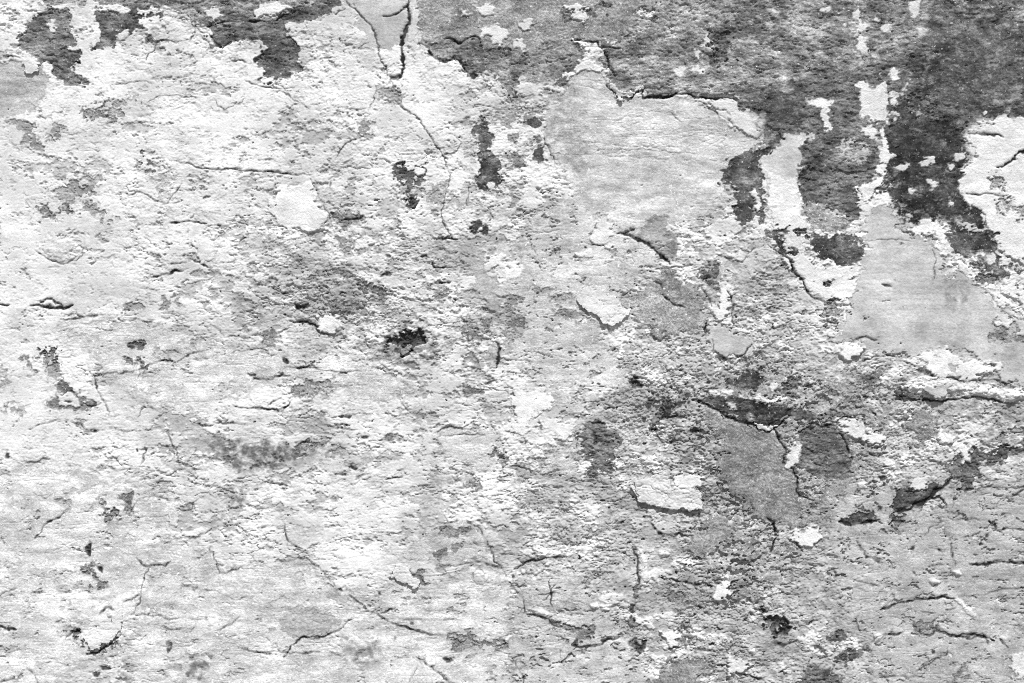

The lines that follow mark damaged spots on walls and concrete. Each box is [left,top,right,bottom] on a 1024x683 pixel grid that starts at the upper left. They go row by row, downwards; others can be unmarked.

crack [337,1,473,74]
crack [374,98,469,284]
spalling [0,0,1024,491]
crack [654,399,886,500]
peeling [630,365,1024,683]